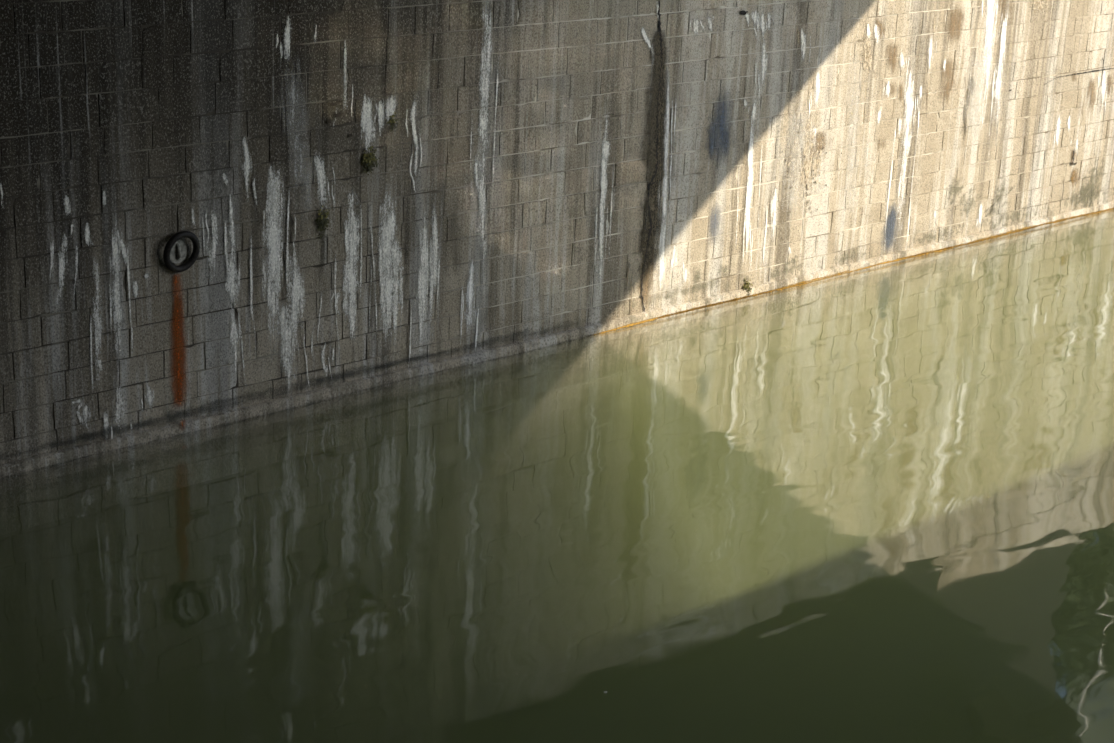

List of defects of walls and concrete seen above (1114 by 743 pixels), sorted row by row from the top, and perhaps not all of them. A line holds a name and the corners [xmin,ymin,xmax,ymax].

corrosion [173,275,186,406]
leakage [276,18,290,57]
leakage [192,139,440,383]
leakage [333,44,422,190]
leakage [461,13,499,347]
leakage [590,0,1114,336]